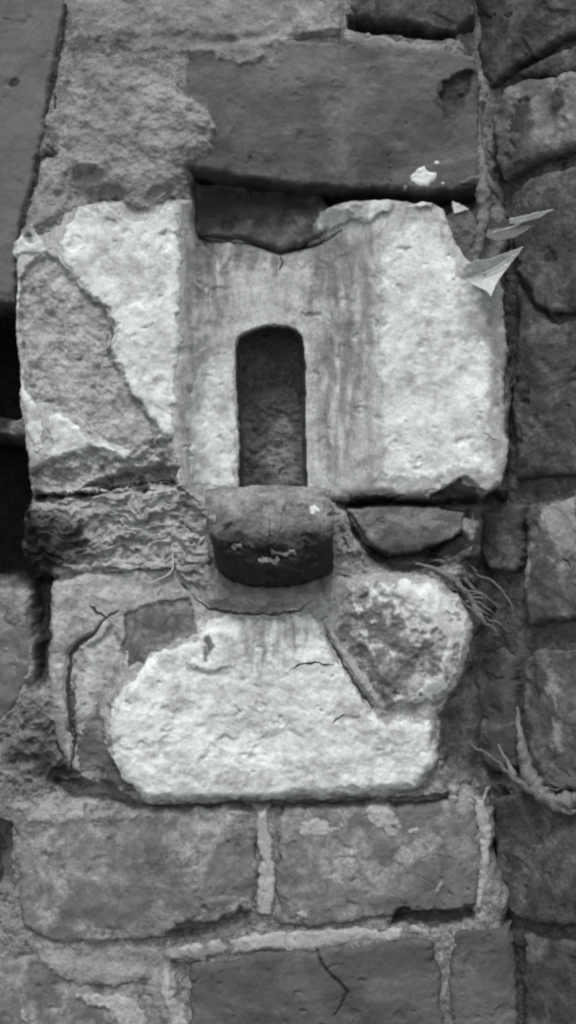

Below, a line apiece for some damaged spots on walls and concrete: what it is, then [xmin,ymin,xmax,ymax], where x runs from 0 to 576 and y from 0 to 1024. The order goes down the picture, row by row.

leakage [195,191,318,321]
leakage [263,418,298,483]
crack [65,605,120,764]
crack [317,950,354,1013]